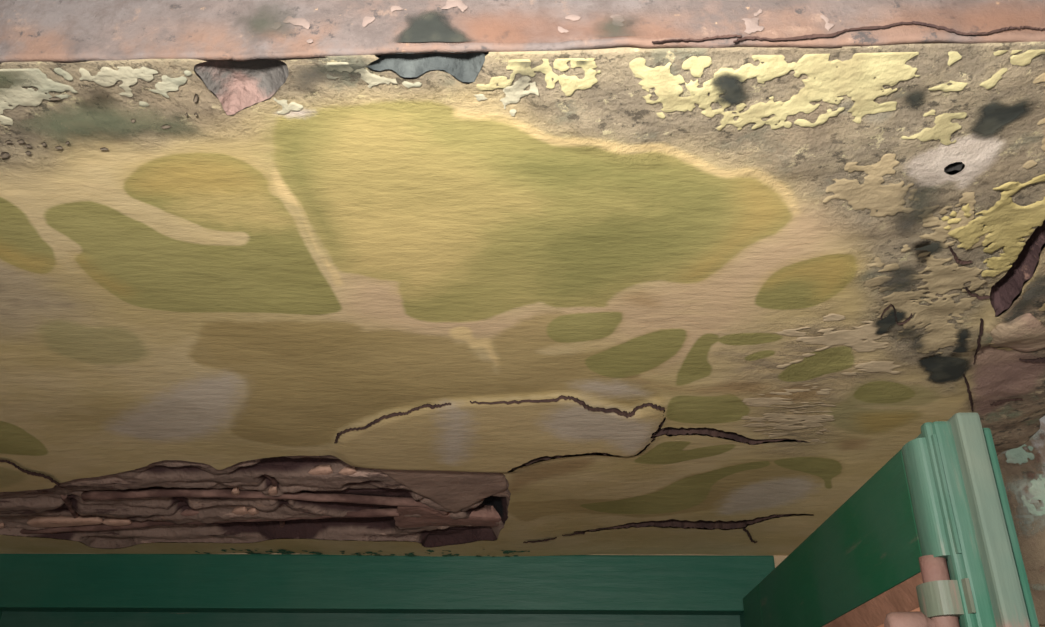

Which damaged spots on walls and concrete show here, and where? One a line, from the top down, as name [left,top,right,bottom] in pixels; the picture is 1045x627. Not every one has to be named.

crack [652,21,1045,43]
peeling [0,60,303,125]
spalling [327,50,600,116]
peeling [629,52,920,131]
leakage [883,100,1030,230]
leakage [0,64,970,524]
peeling [774,153,1045,422]
crack [334,395,808,455]
crack [0,459,60,486]
crack [510,452,610,471]
spalling [0,455,530,557]
crack [523,514,813,544]